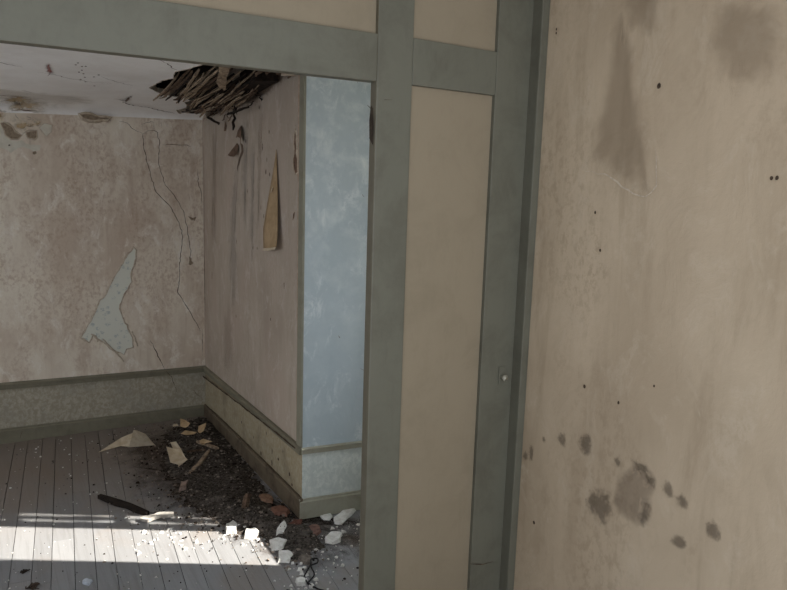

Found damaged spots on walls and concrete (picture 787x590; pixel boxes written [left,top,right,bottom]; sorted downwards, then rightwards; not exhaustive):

spalling [0,122,38,146]
crack [42,72,205,356]
spalling [80,247,138,362]
crack [150,340,300,496]